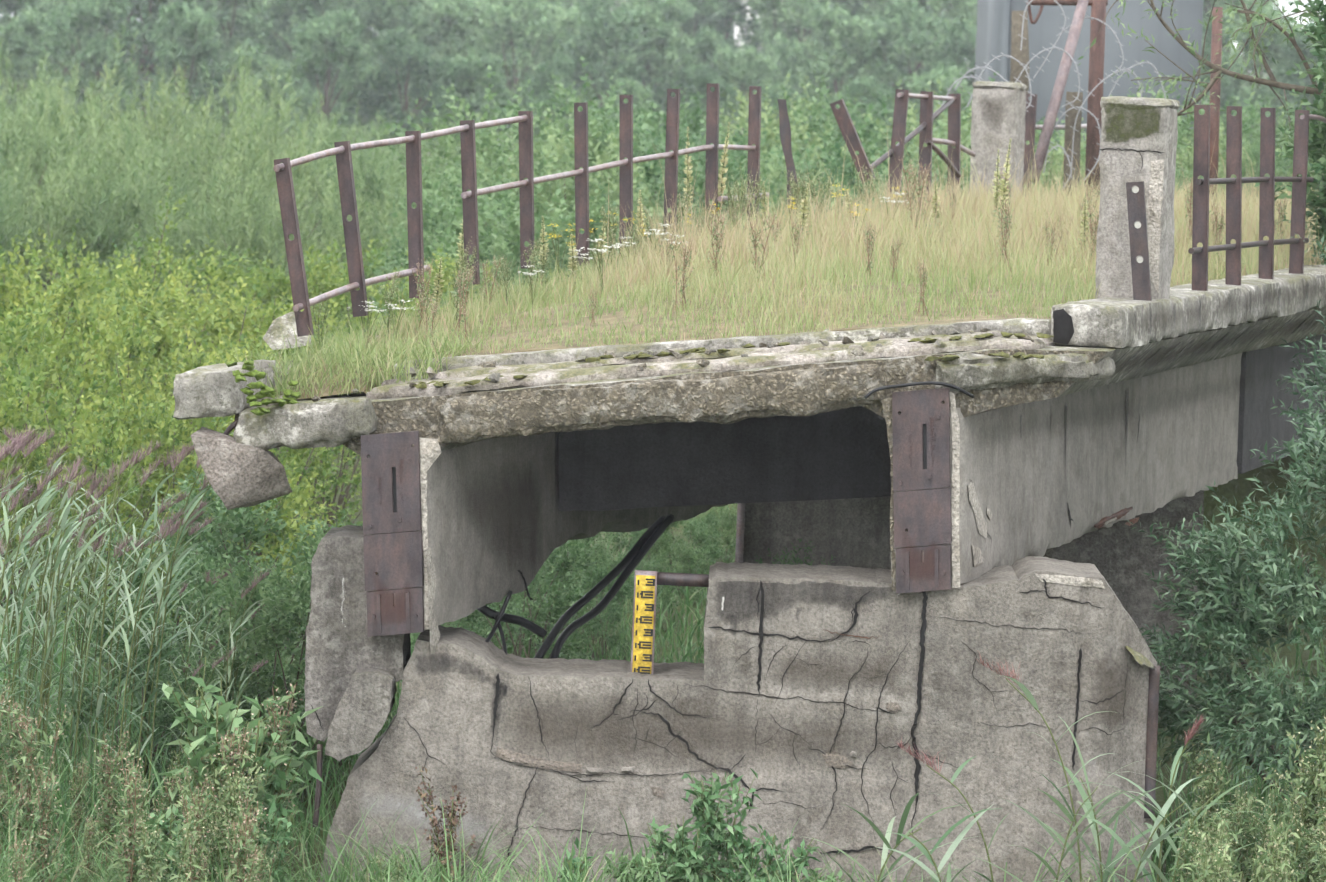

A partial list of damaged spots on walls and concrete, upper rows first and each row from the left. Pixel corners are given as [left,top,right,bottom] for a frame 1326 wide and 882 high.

spalling [233,398,378,451]
crack [518,570,534,603]
crack [490,579,1128,868]